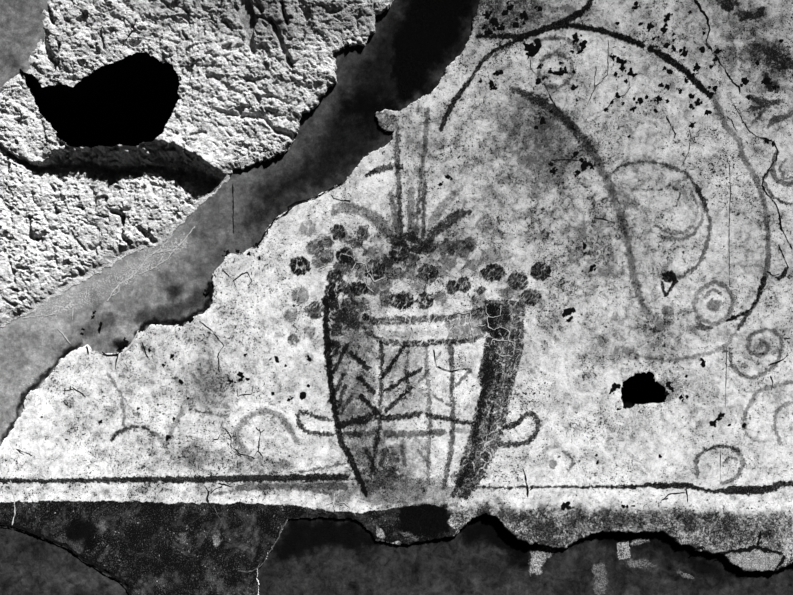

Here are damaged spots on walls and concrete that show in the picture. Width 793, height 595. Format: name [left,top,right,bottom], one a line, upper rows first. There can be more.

spalling [0,0,393,328]
crack [694,0,792,276]
spalling [0,523,130,595]
spalling [257,514,793,595]